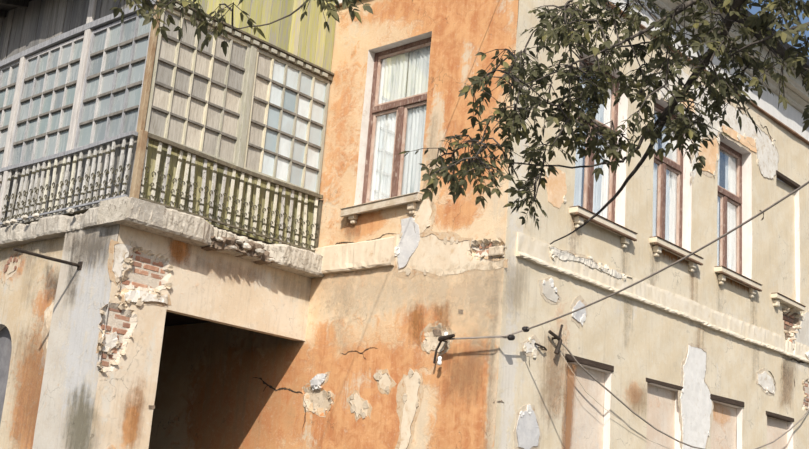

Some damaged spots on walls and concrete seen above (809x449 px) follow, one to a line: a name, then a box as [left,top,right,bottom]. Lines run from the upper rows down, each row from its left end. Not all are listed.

flaking render [644,67,779,183]
flaking render [413,215,507,262]
flaking render [96,239,173,372]
spalling [782,307,805,343]
water stain [68,389,93,449]
crack [253,377,306,430]
flaking render [302,383,335,418]
peeling [346,390,372,422]
peeling [373,368,424,449]
flaking render [513,404,542,449]
flaking render [678,343,714,449]
flaking render [794,377,809,410]